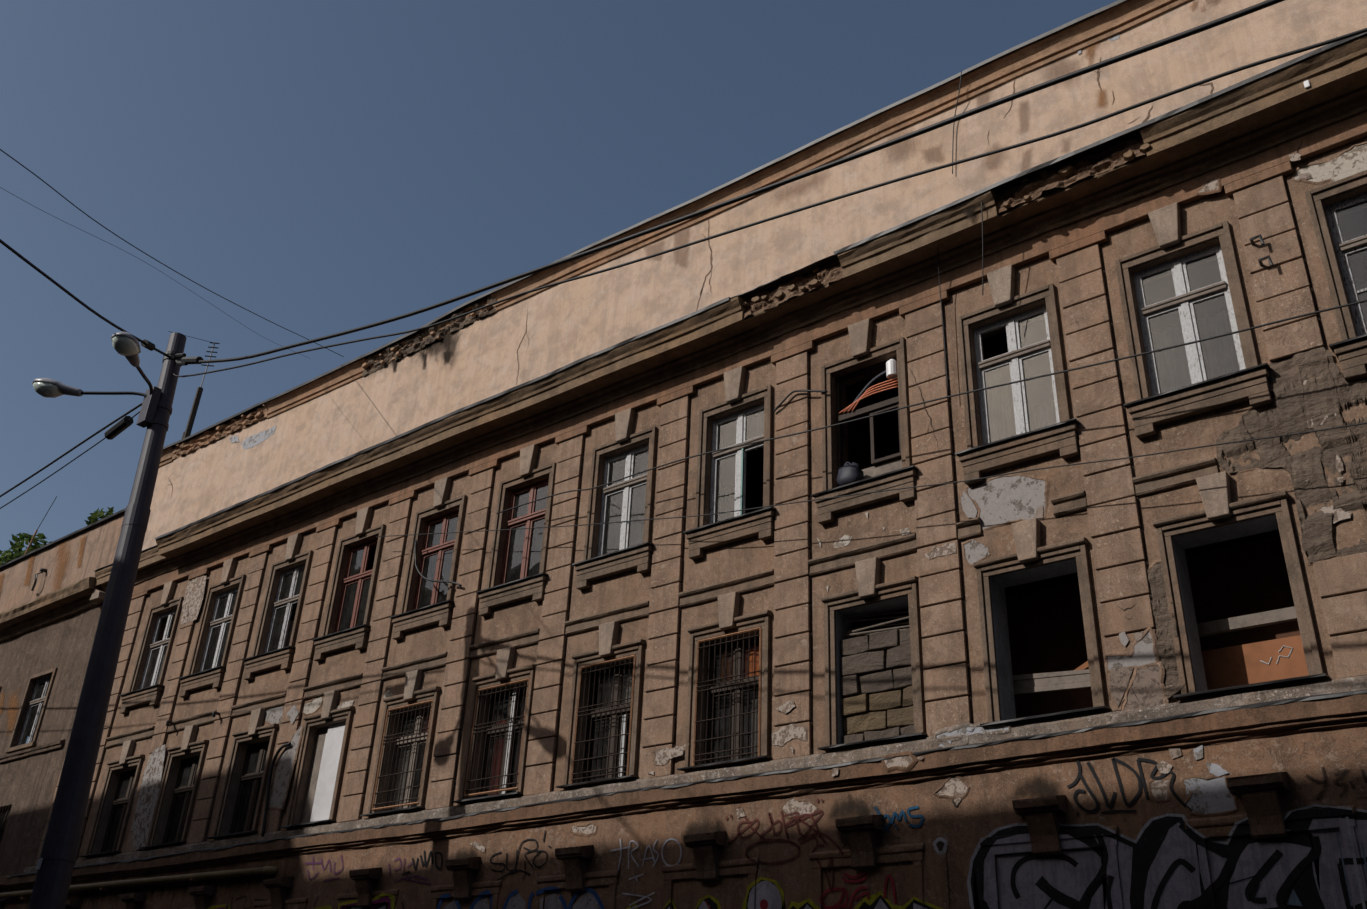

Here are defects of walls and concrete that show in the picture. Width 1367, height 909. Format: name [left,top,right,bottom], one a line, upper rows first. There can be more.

peeling [1123,143,1151,161]
flaking render [1195,175,1222,195]
flaking render [1289,141,1367,185]
peeling [751,266,821,304]
peeling [924,473,1050,568]
flaking render [1104,559,1185,710]
peeling [1146,745,1240,818]